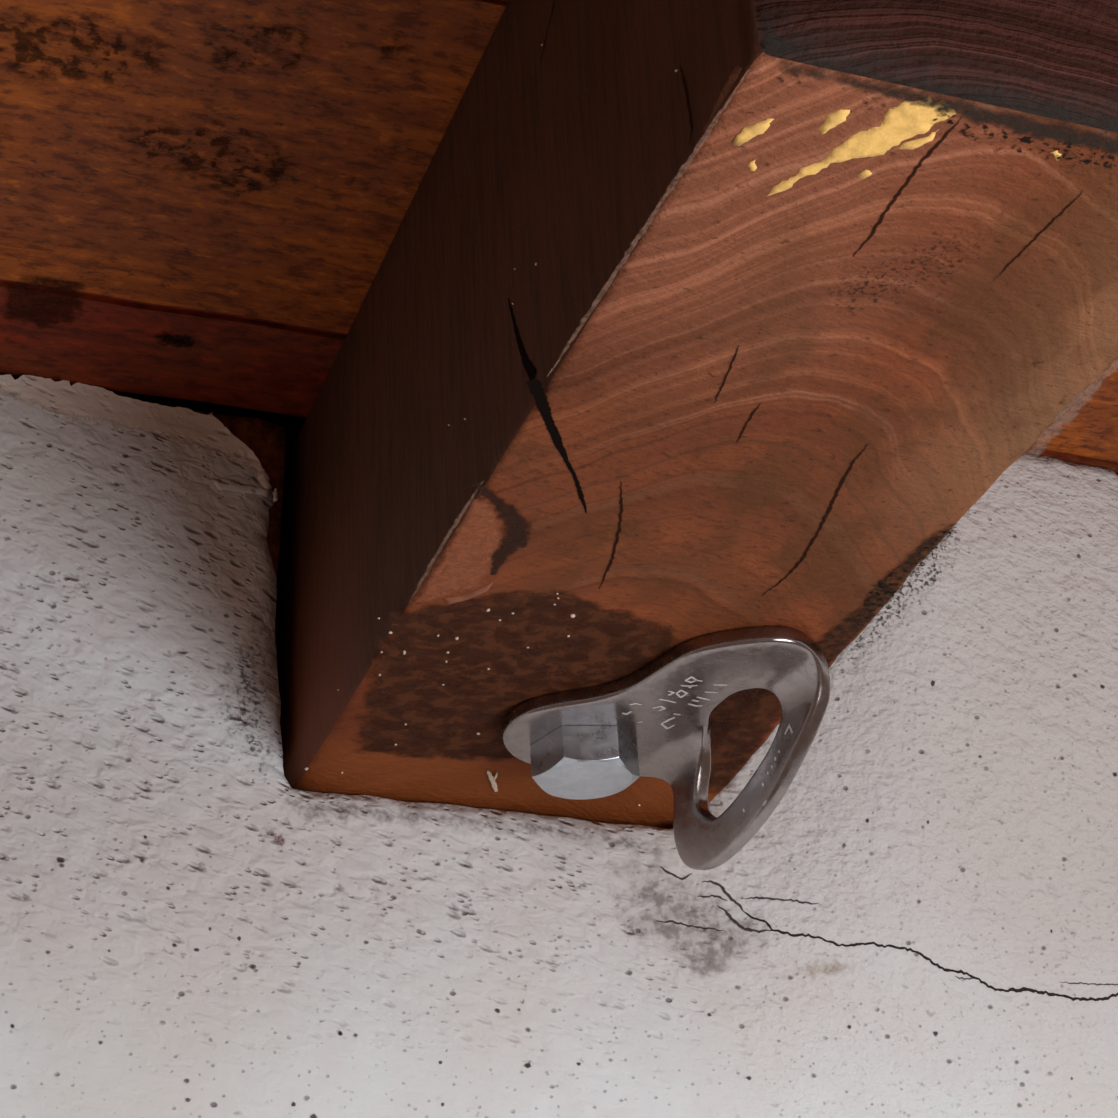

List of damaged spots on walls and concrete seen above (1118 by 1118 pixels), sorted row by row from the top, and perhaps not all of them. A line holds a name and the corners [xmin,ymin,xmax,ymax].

leakage [0,16,162,82]
leakage [132,129,285,192]
spalling [733,118,774,146]
spalling [766,96,956,197]
crack [853,116,963,257]
crack [994,190,1084,280]
crack [599,481,623,589]
crack [762,444,869,596]
leakage [360,592,676,760]
leakage [708,688,781,793]
crack [659,867,1118,1001]